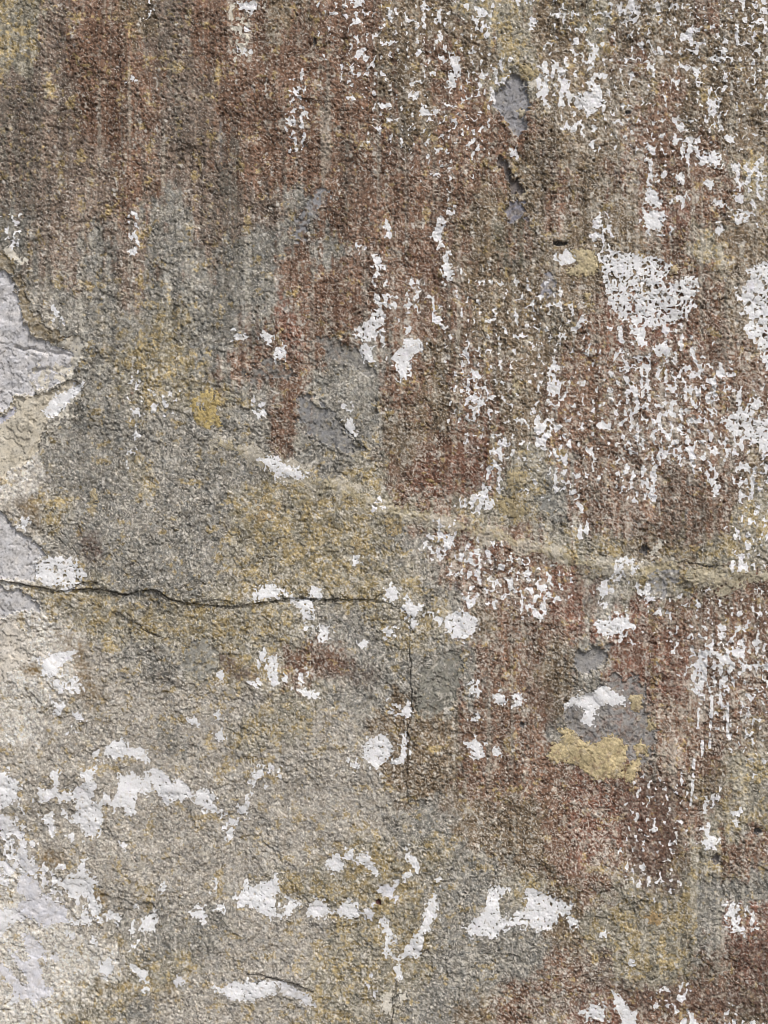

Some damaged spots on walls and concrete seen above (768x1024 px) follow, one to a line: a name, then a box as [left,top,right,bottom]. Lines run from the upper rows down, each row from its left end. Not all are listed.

peeling [127,210,140,256]
spalling [0,213,90,479]
peeling [312,0,768,903]
crack [2,580,418,801]
peeling [0,736,287,1007]
peeling [461,884,579,940]
corrosion [622,780,679,890]
corrosion [623,984,768,1013]